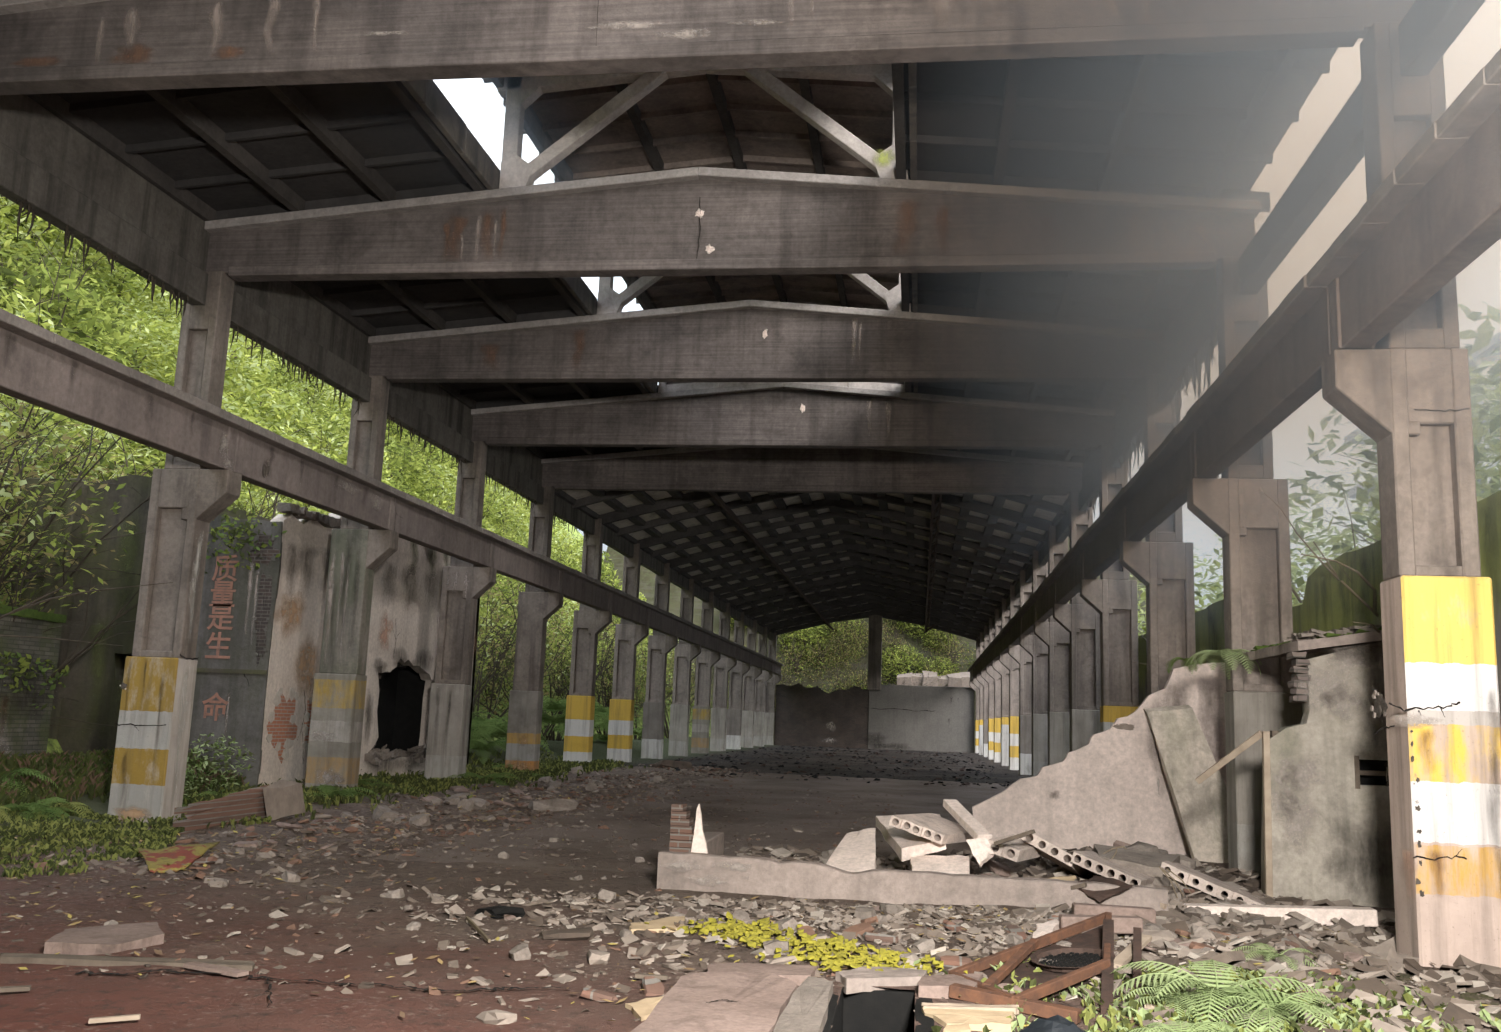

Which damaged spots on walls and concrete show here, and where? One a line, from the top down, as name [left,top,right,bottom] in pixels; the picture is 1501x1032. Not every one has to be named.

crack [115,723,166,731]
spalling [173,646,315,834]
crack [1375,701,1461,737]
crack [1413,849,1467,861]